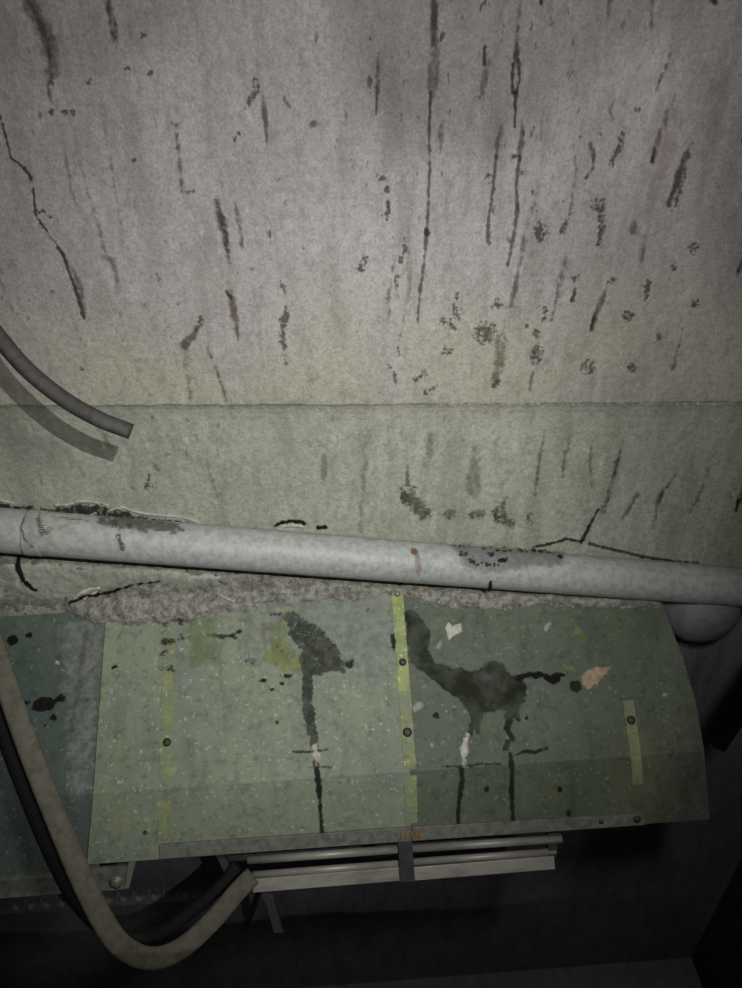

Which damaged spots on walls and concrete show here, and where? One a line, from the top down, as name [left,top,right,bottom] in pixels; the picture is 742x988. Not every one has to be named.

leakage [248,77,268,141]
leakage [511,43,521,128]
crack [0,115,85,319]
leakage [215,199,243,258]
leakage [379,175,391,221]
leakage [667,151,690,214]
leakage [181,315,204,349]
leakage [226,290,239,337]
leakage [279,305,290,363]
crack [535,509,699,564]
leakage [260,611,354,833]
leakage [391,610,582,824]